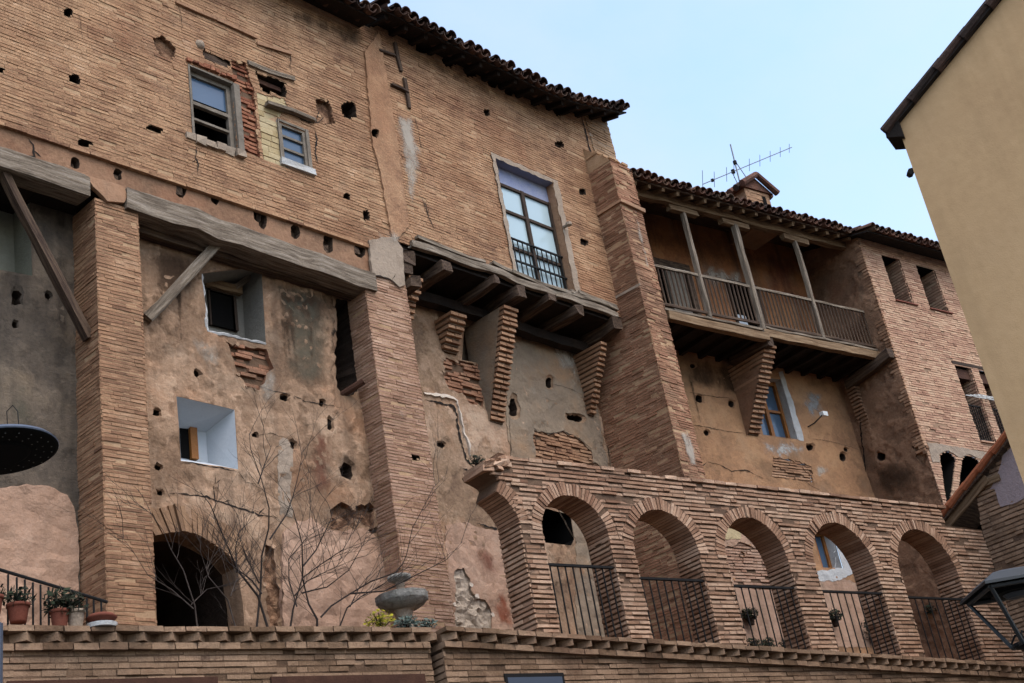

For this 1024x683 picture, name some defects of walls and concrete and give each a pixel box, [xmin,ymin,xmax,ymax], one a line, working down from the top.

flaking render [203,49,287,158]
spalling [226,340,274,391]
spalling [533,413,599,466]
spalling [771,443,815,482]
spalling [330,502,377,533]
spalling [453,568,495,629]